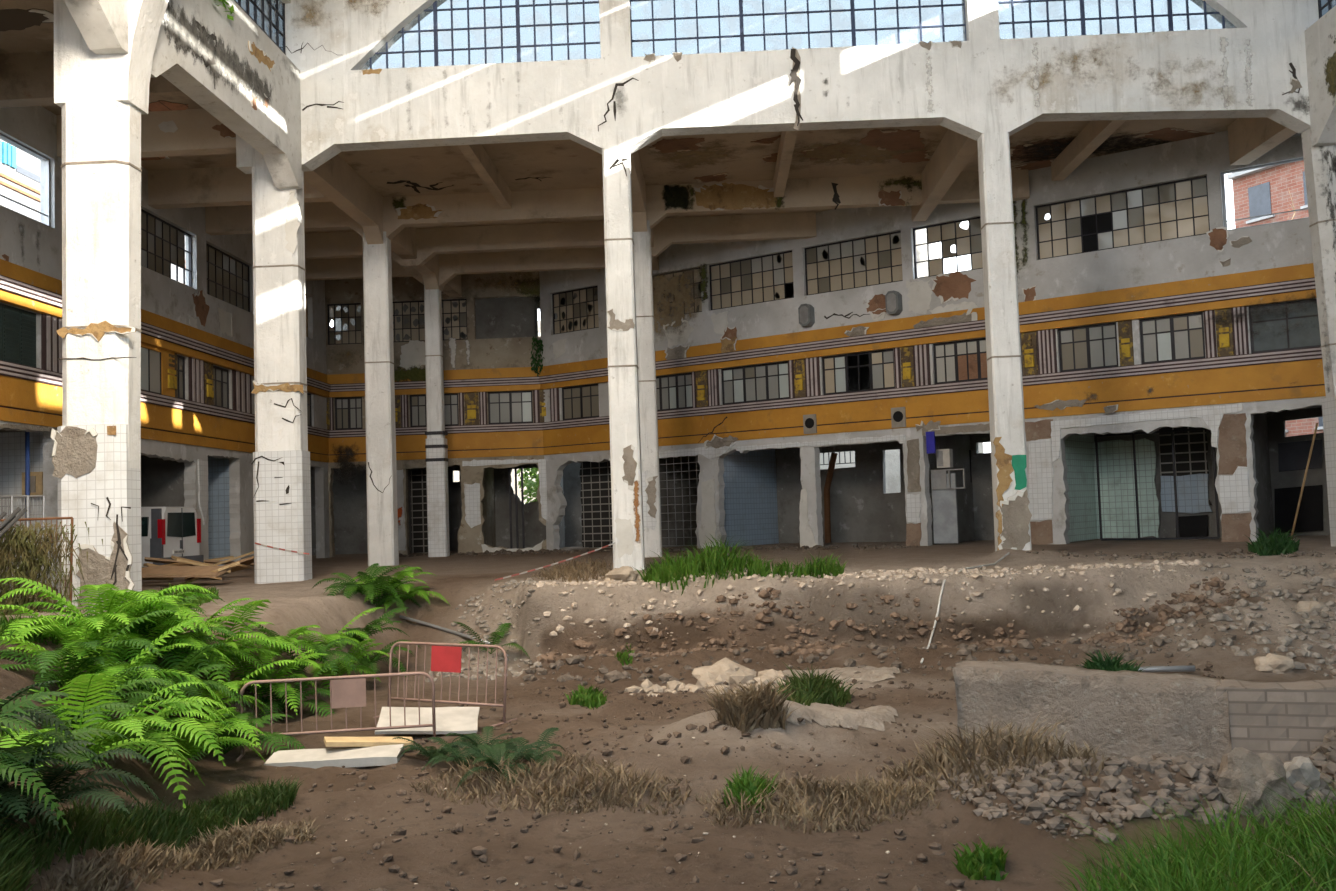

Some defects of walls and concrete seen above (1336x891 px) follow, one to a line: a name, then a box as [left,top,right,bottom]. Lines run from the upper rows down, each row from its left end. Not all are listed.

crack [598,78,639,131]
crack [789,47,803,130]
crack [609,159,629,176]
water stain [1319,145,1336,248]
spalling [906,271,978,328]
spalling [50,426,116,479]
spalling [993,437,1032,550]
crack [91,497,131,589]